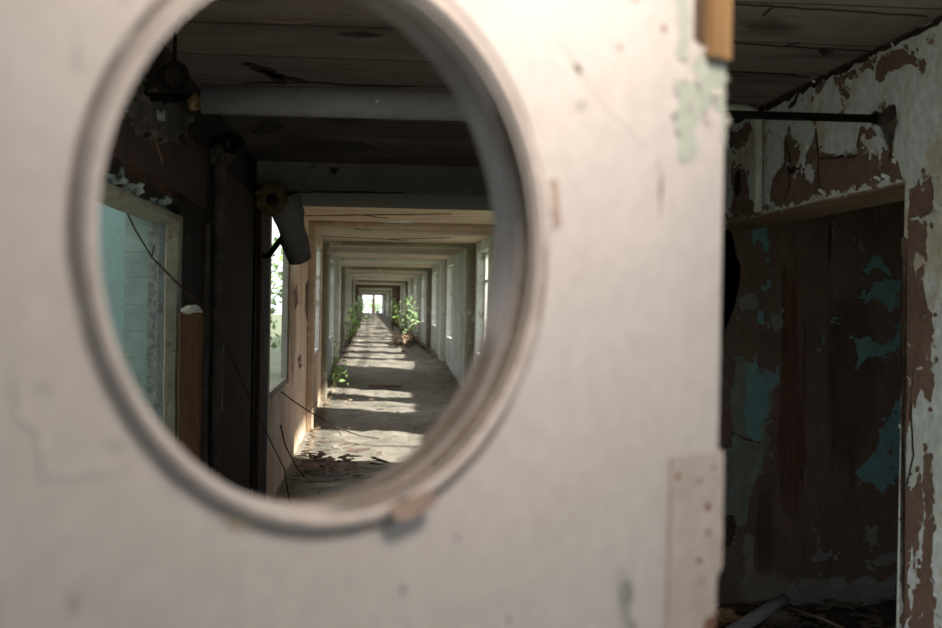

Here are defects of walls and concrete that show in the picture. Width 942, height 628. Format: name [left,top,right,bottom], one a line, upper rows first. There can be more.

peeling [122,73,195,155]
peeling [672,0,938,628]